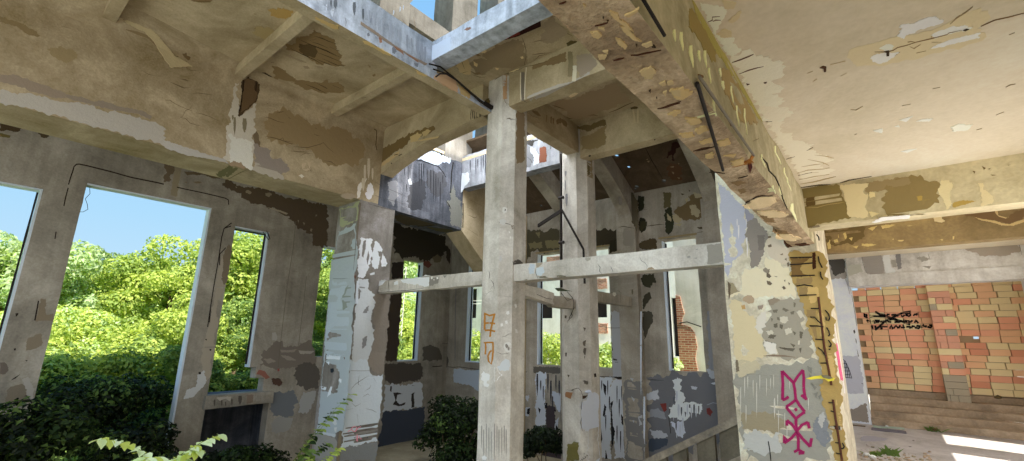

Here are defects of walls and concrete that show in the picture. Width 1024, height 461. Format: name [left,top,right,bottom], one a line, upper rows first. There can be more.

spalling [238,77,260,117]
spalling [271,17,345,94]
peeling [590,7,656,60]
peeling [639,66,745,166]
spalling [163,164,329,248]
peeling [742,196,788,218]
crack [693,121,872,209]
peeling [840,183,904,241]
peeling [257,237,446,448]
spalling [727,232,875,461]
peeling [525,373,642,459]